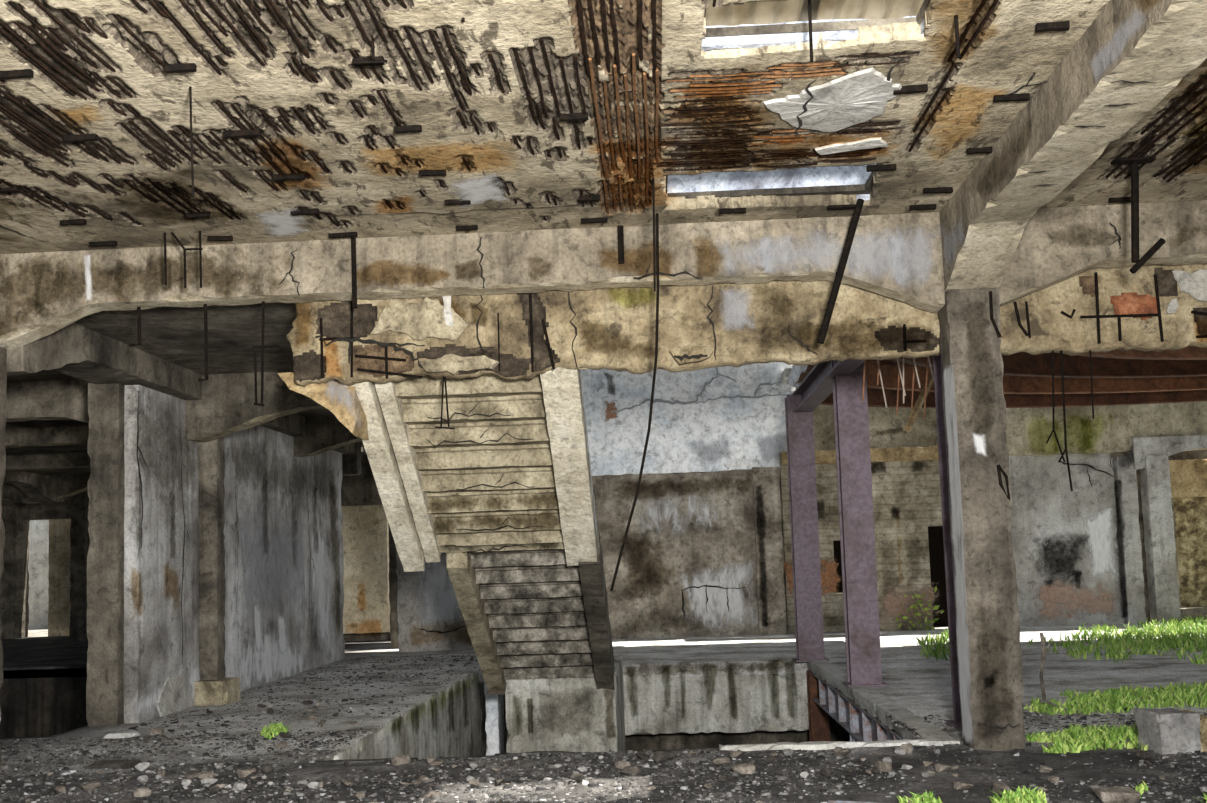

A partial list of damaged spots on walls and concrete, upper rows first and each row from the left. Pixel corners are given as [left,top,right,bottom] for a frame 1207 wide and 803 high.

spalling [0,0,1002,229]
spalling [1096,59,1207,185]
flaking render [278,293,560,440]
spalling [1079,267,1207,344]
damp [623,480,768,627]
damp [1039,447,1134,618]
damp [627,663,737,716]
damp [748,660,794,716]